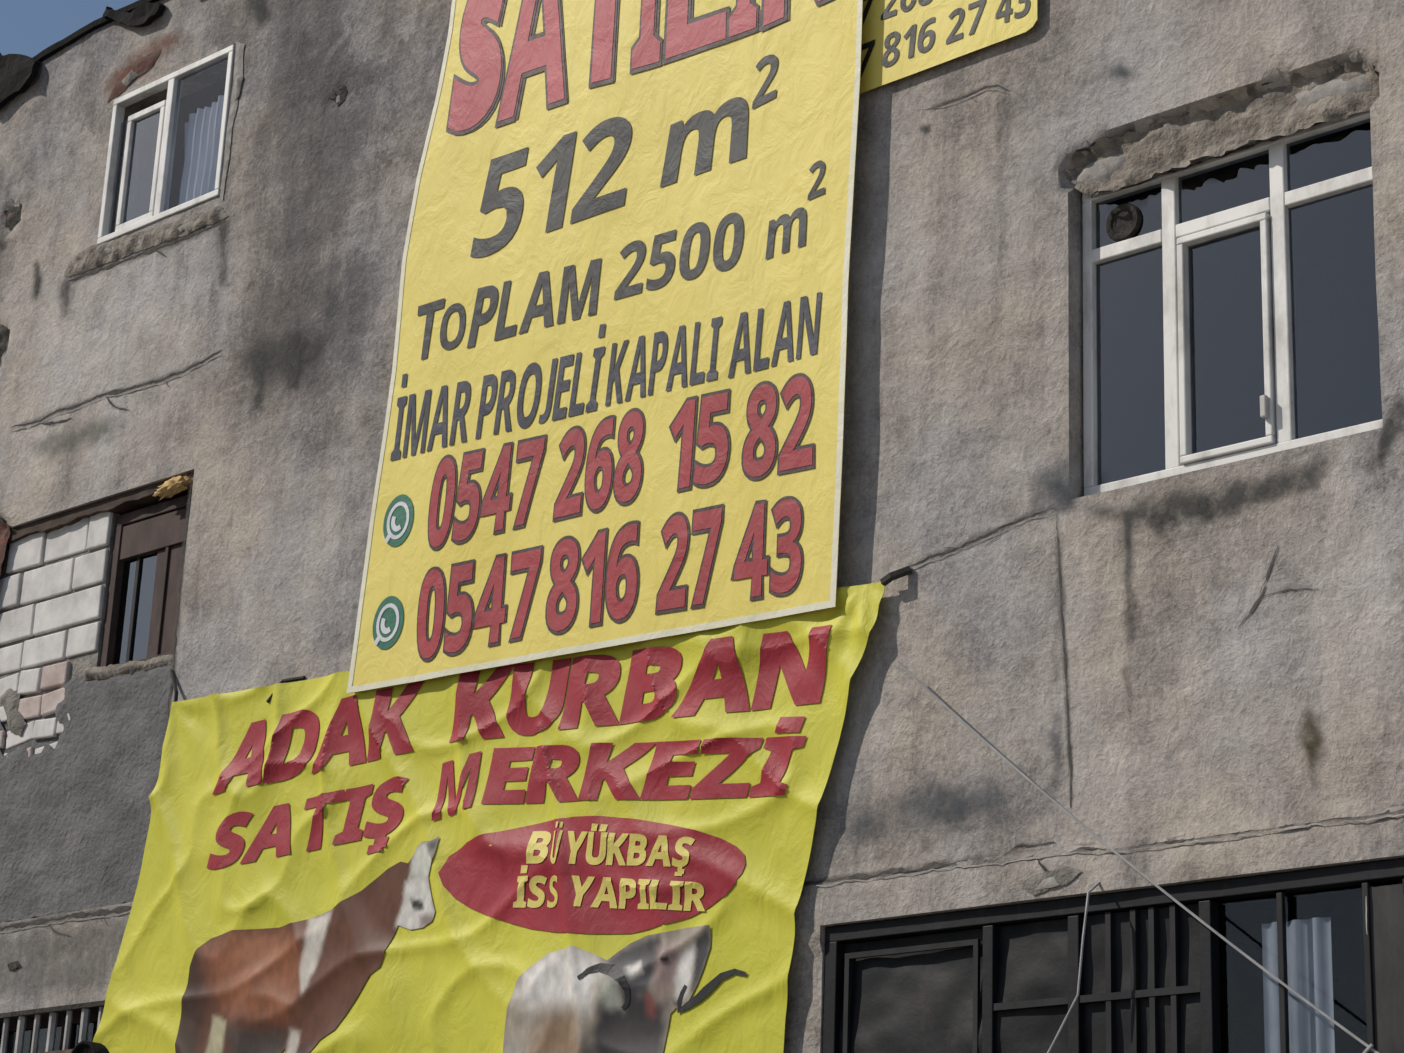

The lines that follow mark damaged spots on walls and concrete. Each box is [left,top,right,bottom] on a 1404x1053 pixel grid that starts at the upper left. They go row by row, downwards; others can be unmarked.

spalling [107,50,161,102]
spalling [1065,61,1379,195]
spalling [0,324,10,369]
crack [12,350,221,431]
spalling [0,518,10,574]
water stain [1124,467,1316,547]
crack [1238,547,1318,628]
crack [909,508,1079,808]
crack [803,809,1404,888]
crack [0,906,132,937]